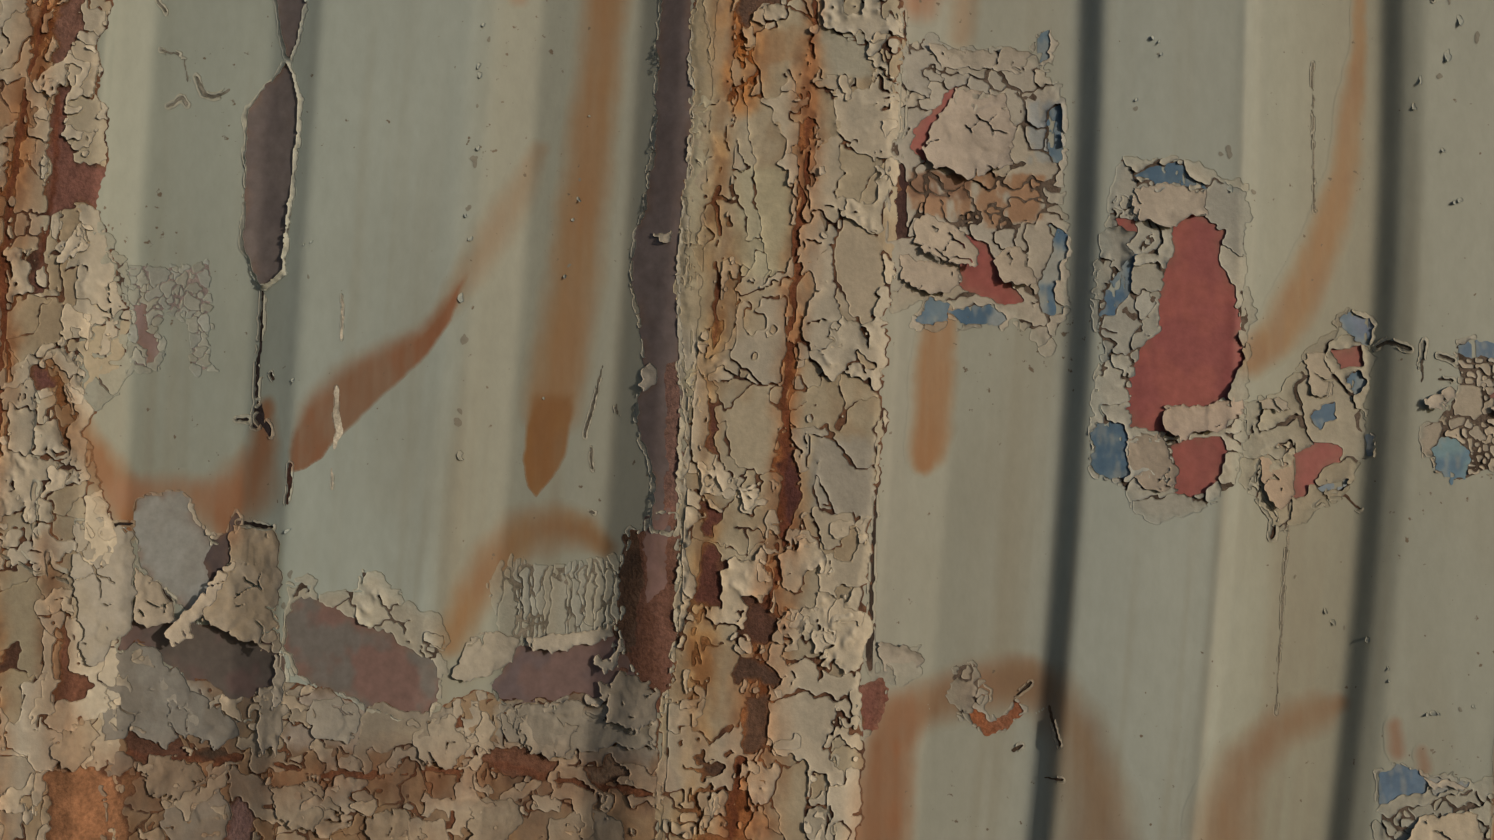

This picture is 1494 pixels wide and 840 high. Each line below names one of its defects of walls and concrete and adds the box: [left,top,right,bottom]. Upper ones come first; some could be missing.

peeling [0,0,1073,840]
peeling [1088,145,1378,532]
peeling [1419,334,1494,485]
peeling [1372,762,1494,840]